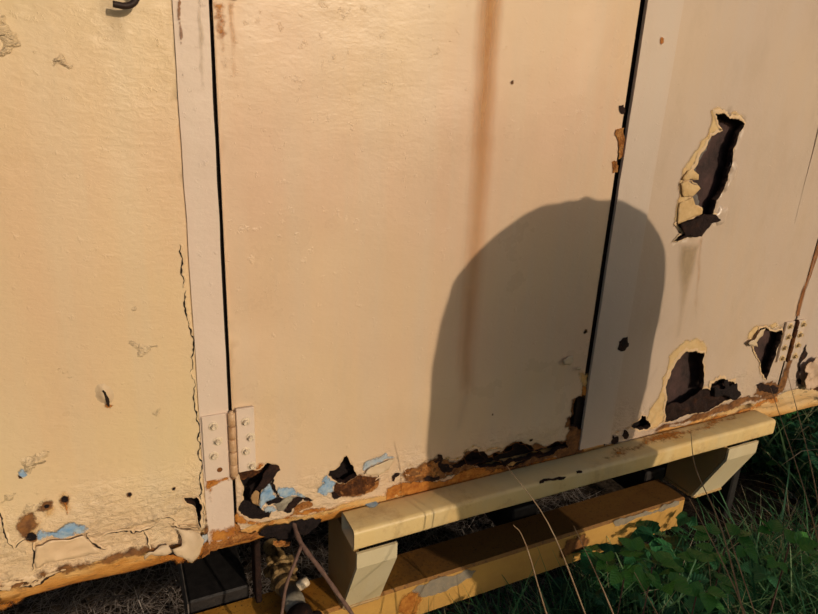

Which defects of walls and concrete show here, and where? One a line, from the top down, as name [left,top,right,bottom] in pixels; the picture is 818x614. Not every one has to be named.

rust [481,0,494,127]
spalling [676,114,739,237]
rust [796,244,818,317]
crack [86,244,206,550]
spalling [665,351,701,411]
rust [606,360,793,458]
spalling [748,328,777,374]
spalling [242,463,270,508]
rust [0,396,584,589]
peeling [329,453,395,480]
peeling [144,527,204,563]
rust [398,592,422,614]